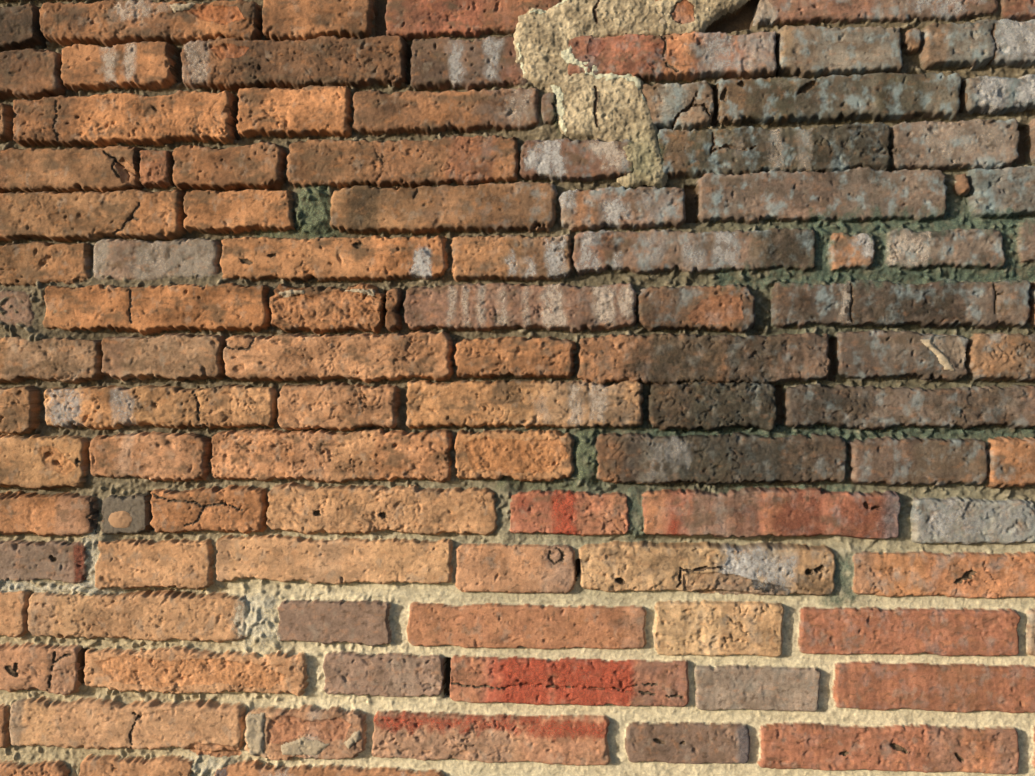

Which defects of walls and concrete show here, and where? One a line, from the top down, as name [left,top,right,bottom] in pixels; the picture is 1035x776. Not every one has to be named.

peeling [513,0,777,189]
water stain [979,74,1035,114]
crack [102,150,120,178]
water stain [524,140,577,207]
crack [112,202,140,239]
water stain [604,199,629,227]
water stain [857,233,874,257]
water stain [542,240,566,327]
water stain [593,285,635,322]
crack [152,493,243,527]
crack [676,566,734,588]
crack [46,645,71,691]